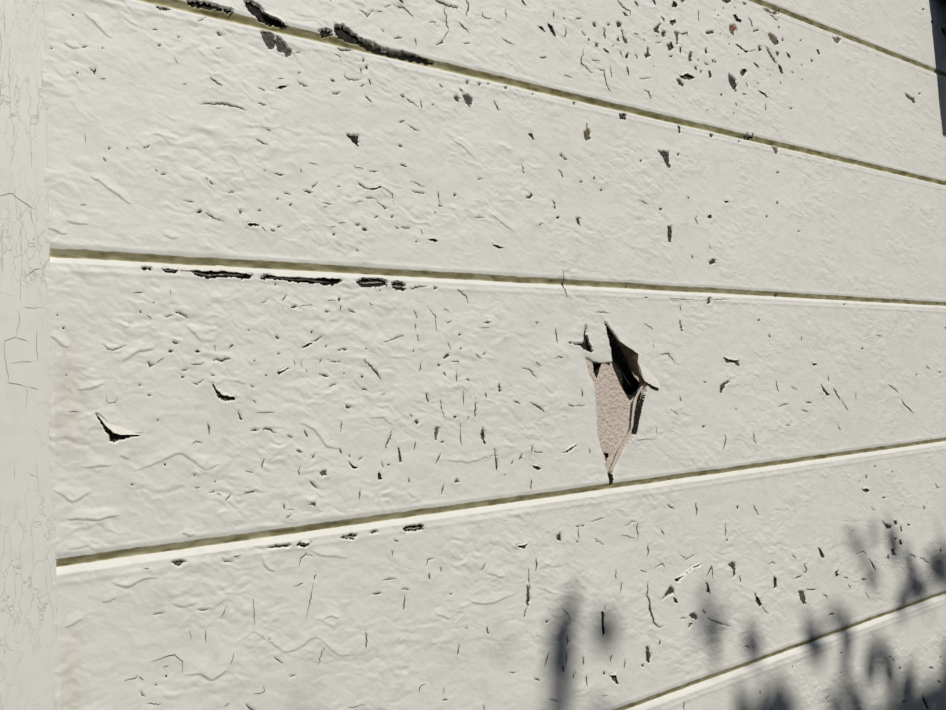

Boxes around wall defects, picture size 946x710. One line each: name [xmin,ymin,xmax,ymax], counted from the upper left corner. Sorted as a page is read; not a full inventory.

spalling [187,1,291,57]
spalling [317,25,433,65]
peeling [653,0,716,87]
peeling [744,27,791,73]
peeling [728,67,747,91]
spalling [141,265,341,286]
spalling [356,278,407,291]
peeling [569,323,660,474]
peeling [96,413,143,442]
peeling [663,561,702,603]